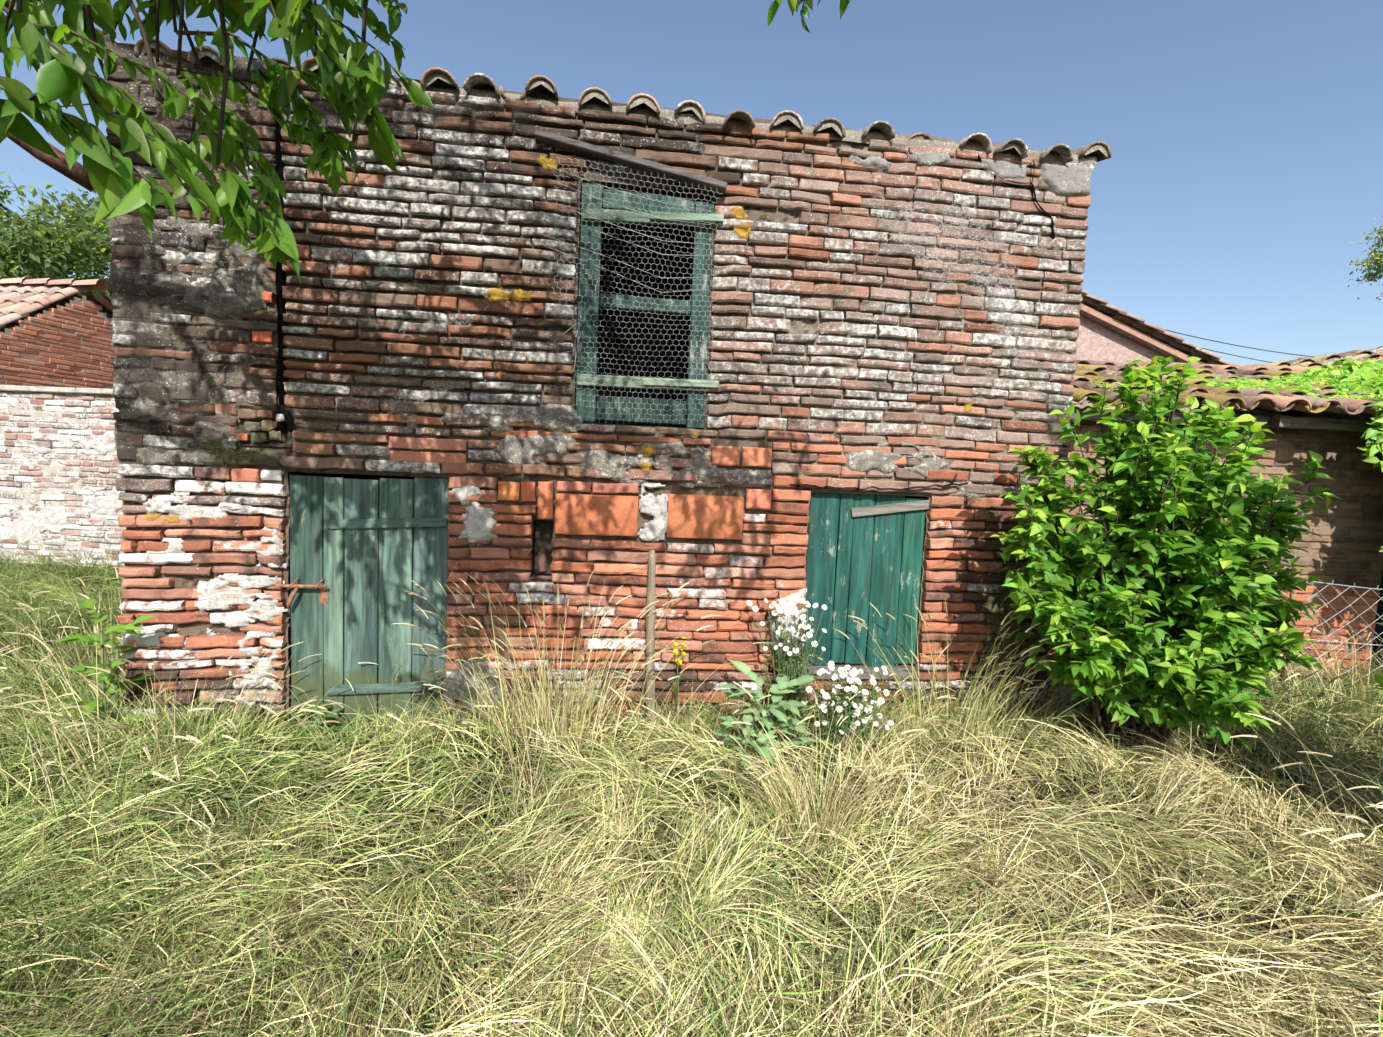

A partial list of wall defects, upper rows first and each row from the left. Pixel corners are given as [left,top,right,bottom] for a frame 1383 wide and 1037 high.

damp [121,216,160,449]
flaking render [452,484,498,546]
flaking render [194,526,288,706]